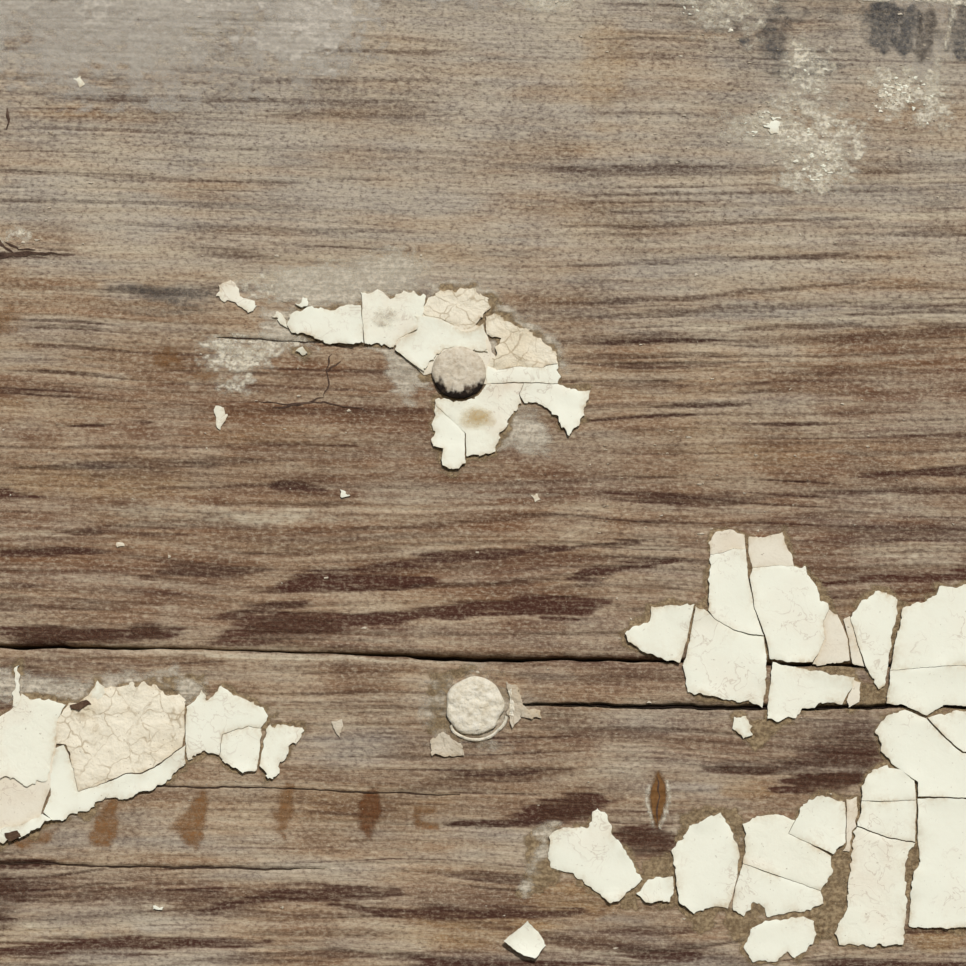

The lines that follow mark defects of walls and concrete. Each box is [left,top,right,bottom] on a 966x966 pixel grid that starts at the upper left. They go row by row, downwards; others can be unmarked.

peeling [214,247,592,478]
peeling [0,658,306,851]
crack [527,702,767,710]
peeling [516,526,966,965]
crack [801,703,905,711]